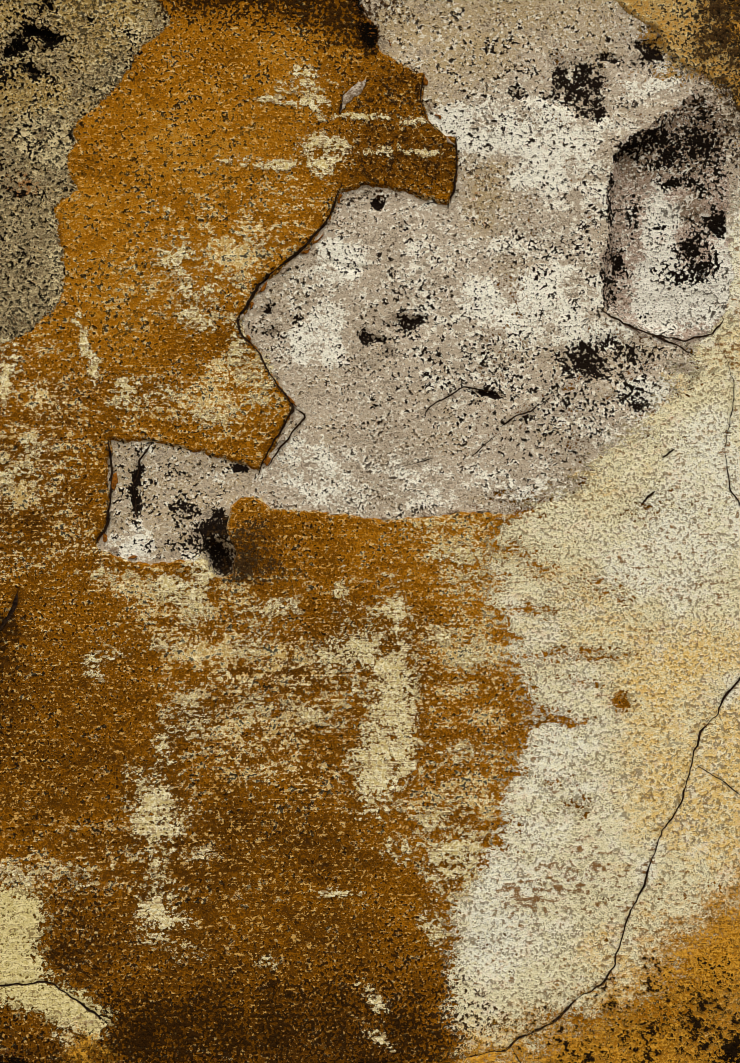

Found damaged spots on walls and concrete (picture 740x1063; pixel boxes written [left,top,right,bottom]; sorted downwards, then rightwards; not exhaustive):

water stain [124,0,463,201]
peeling [214,58,444,187]
crack [473,397,550,455]
crack [600,308,740,506]
peeling [224,571,457,821]
peeling [117,682,223,963]
crack [446,677,740,1063]
crack [0,980,107,1023]
corrosion [61,1022,118,1063]
water stain [0,878,740,1063]
peeling [354,976,396,1053]
corrosion [440,877,740,1063]